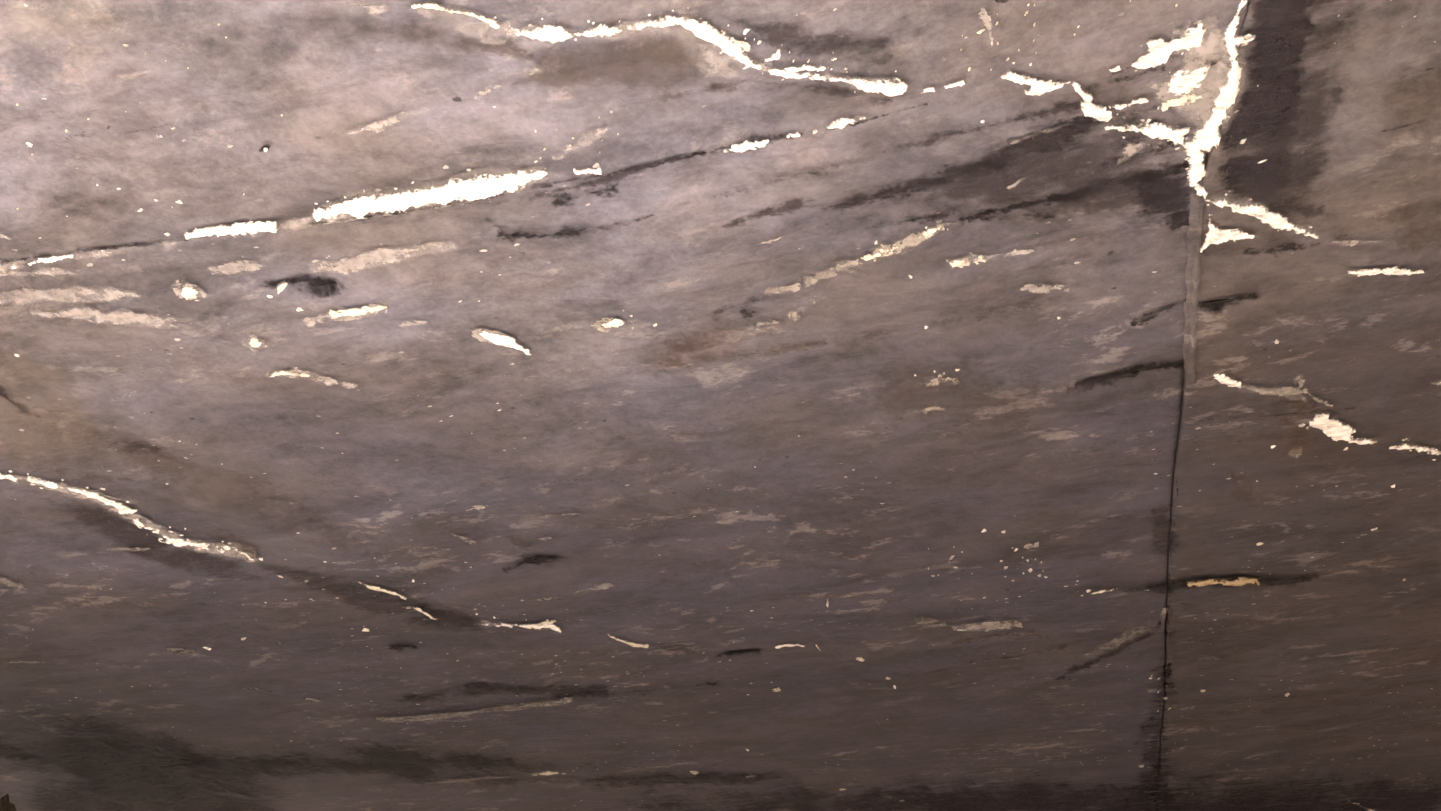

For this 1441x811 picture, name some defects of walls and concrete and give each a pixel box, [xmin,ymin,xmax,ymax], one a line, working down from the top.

water stain [1218,0,1344,217]
crack [0,3,965,271]
crack [980,0,1424,277]
water stain [1244,243,1320,255]
peeling [472,329,531,356]
crack [0,387,38,417]
crack [1213,374,1441,461]
crack [0,470,326,582]
crack [360,579,437,620]
crack [475,613,561,633]
crack [608,634,649,648]